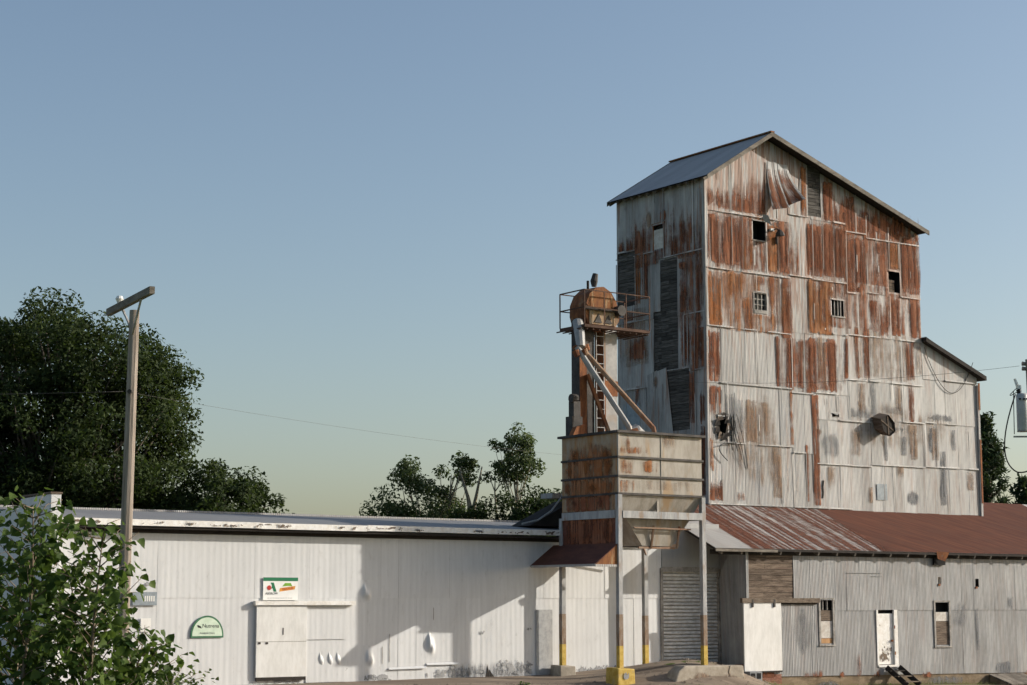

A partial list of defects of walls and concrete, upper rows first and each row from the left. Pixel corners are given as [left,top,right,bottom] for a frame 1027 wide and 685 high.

corrosion [565,358,652,545]
corrosion [619,167,1027,554]